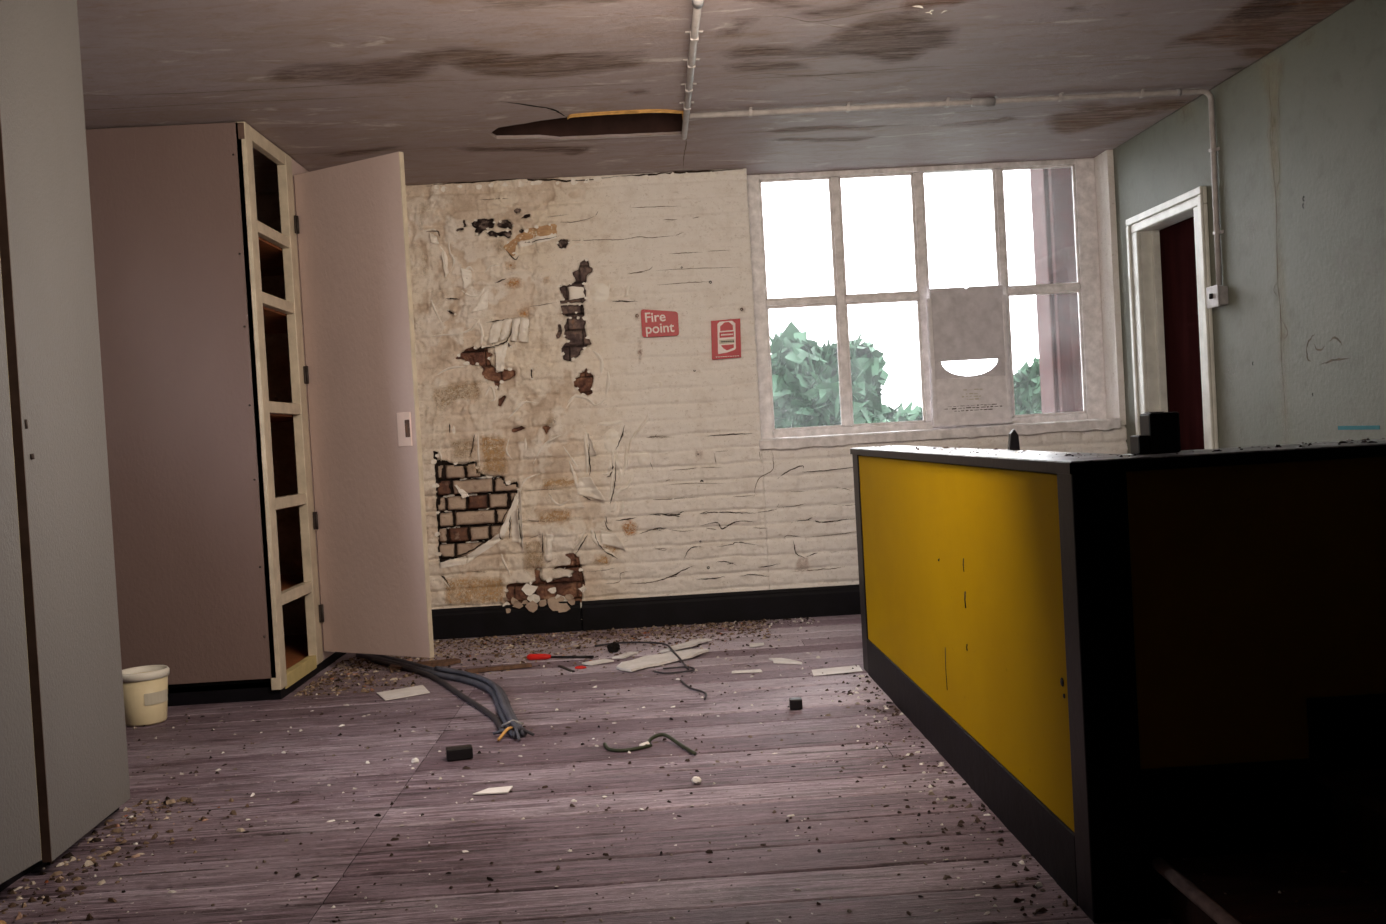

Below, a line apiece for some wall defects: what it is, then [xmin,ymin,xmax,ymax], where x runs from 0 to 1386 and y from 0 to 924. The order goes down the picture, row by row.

water stain [318,50,633,80]
water stain [831,0,962,61]
peeling [456,208,570,257]
spalling [430,233,529,406]
spalling [556,258,595,396]
flaking render [431,451,524,568]
spalling [500,533,586,613]